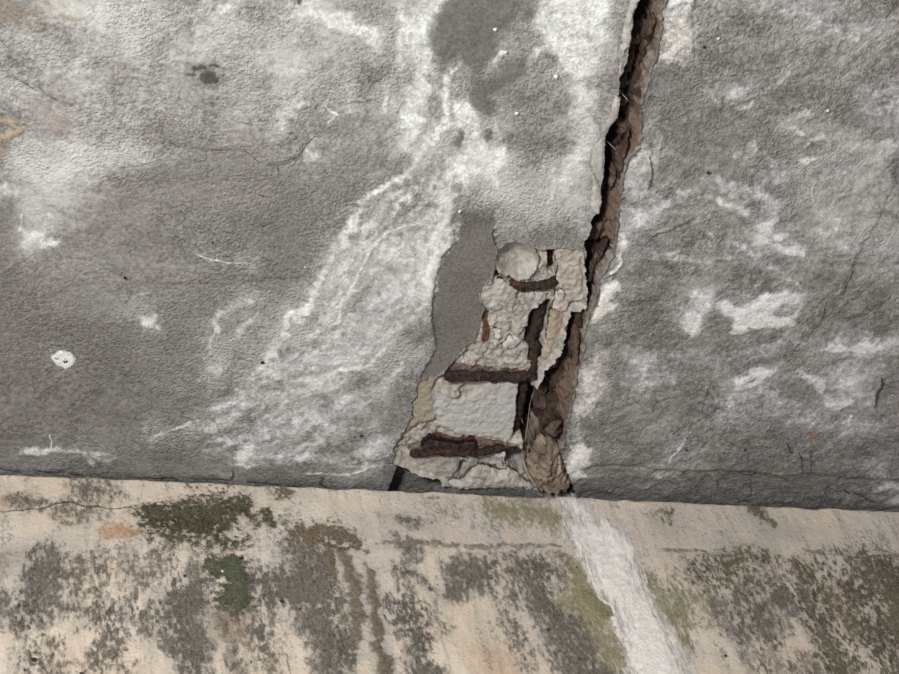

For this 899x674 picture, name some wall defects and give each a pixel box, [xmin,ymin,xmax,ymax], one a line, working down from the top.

damp [151,0,614,481]
crack [519,0,662,454]
damp [141,314,159,330]
spalling [393,218,588,494]
efflorescence [627,354,658,395]
damp [266,486,295,500]
damp [875,465,899,505]
damp [0,494,695,674]
damp [675,541,899,674]